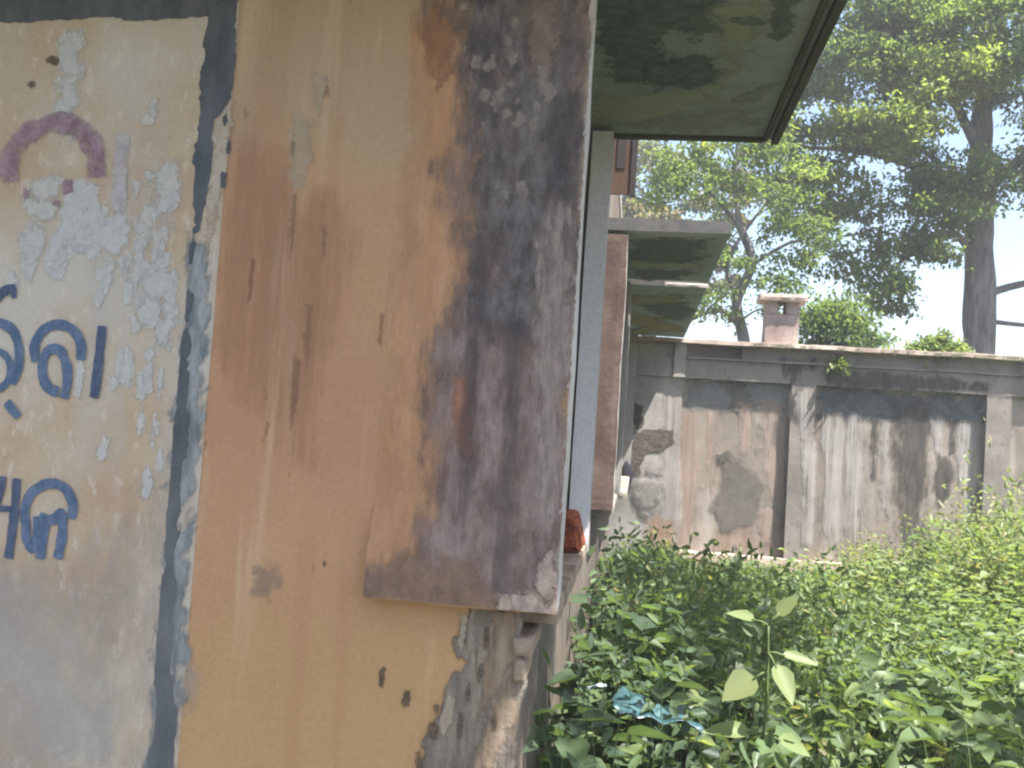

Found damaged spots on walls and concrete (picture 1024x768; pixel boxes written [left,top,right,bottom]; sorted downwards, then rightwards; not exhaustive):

peeling [4,158,184,501]
water stain [363,0,803,609]
peeling [631,400,789,551]
water stain [658,357,989,559]
spalling [401,690,411,707]
spalling [415,509,586,768]